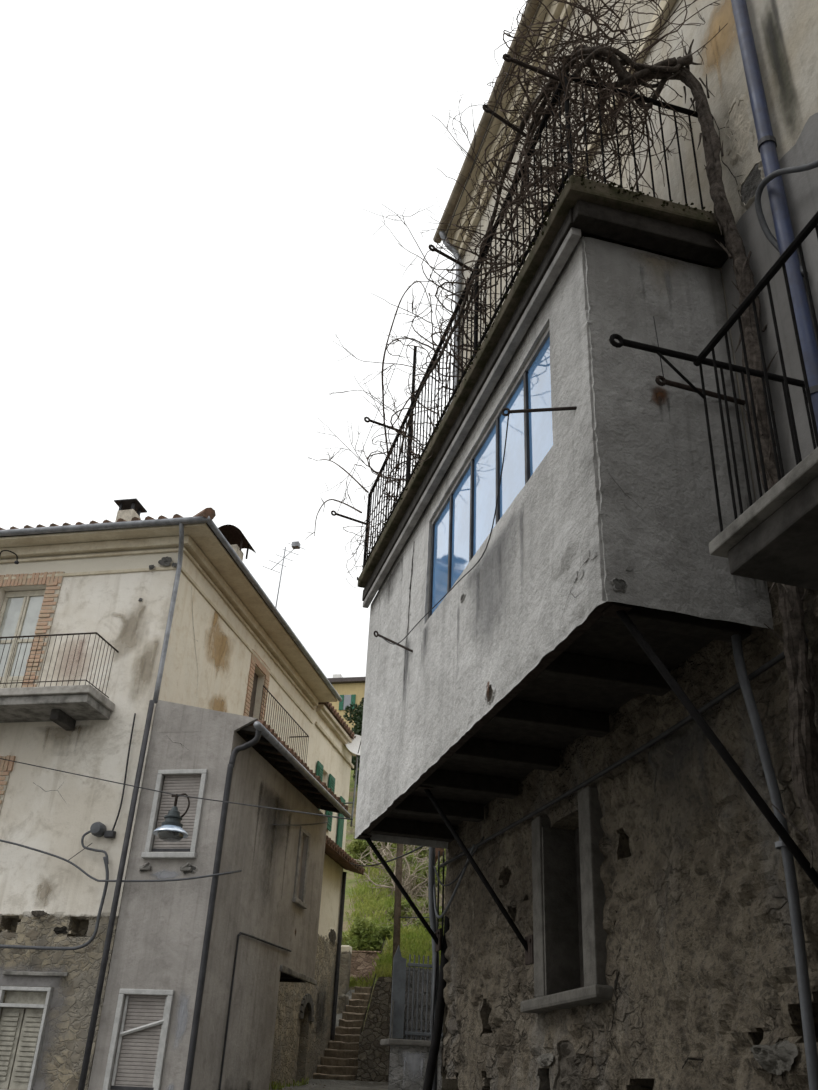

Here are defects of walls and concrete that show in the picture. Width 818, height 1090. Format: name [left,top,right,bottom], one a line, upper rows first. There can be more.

water stain [765,0,795,124]
rust [654,388,669,407]
crack [562,531,597,616]
water stain [211,612,228,668]
spalling [537,1033,594,1090]